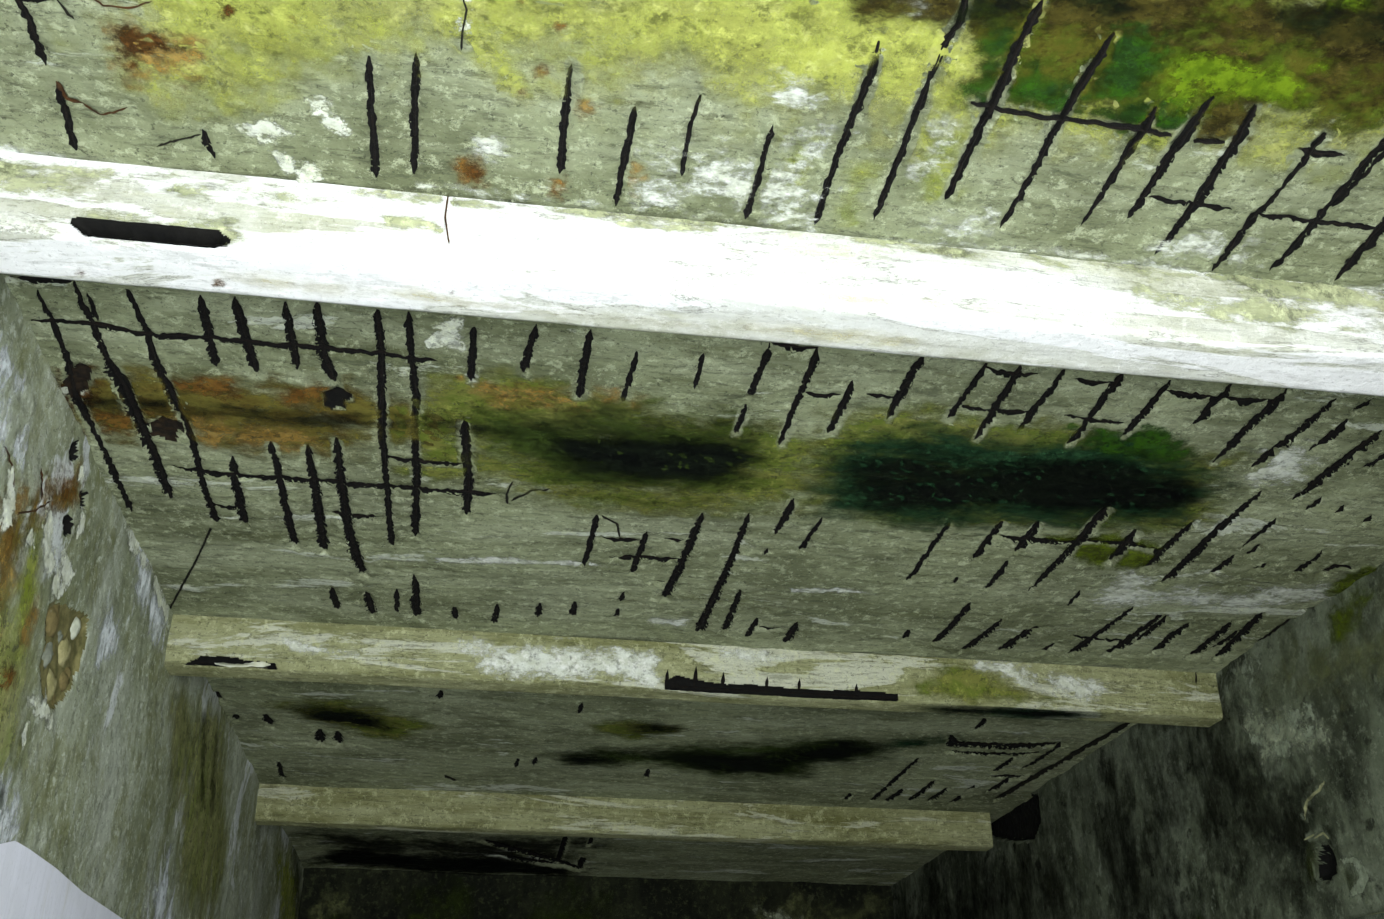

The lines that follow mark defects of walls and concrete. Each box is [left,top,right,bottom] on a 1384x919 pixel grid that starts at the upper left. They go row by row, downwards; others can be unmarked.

crack [57,0,150,19]
corrosion [102,25,205,88]
crack [56,81,128,115]
leakage [773,88,810,107]
spalling [520,324,539,373]
corrosion [54,366,512,457]
flaking render [0,466,16,532]
spalling [10,276,497,749]
leakage [393,367,1330,608]
corrosion [0,473,80,647]
leakage [562,720,946,778]
crack [994,723,1130,799]